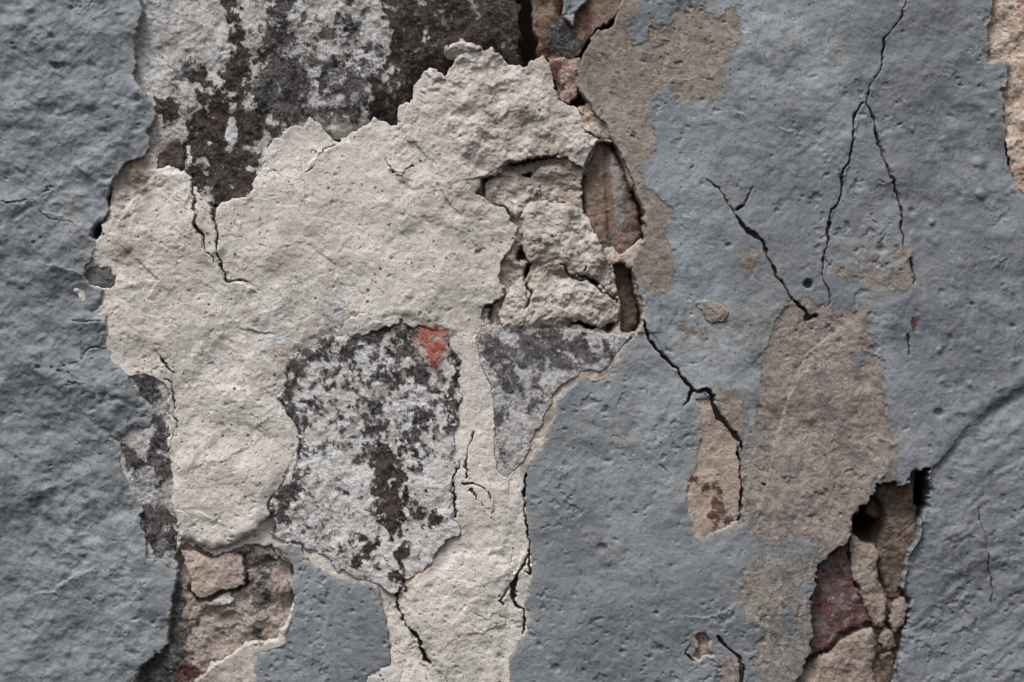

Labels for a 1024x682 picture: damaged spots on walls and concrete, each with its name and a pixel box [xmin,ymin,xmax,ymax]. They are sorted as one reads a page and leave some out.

crack [191,174,254,286]
crack [702,0,916,321]
spalling [987,0,1024,194]
spalling [73,0,743,682]
crack [452,431,494,520]
crack [499,473,531,635]
crack [643,320,743,521]
peeling [686,296,928,682]